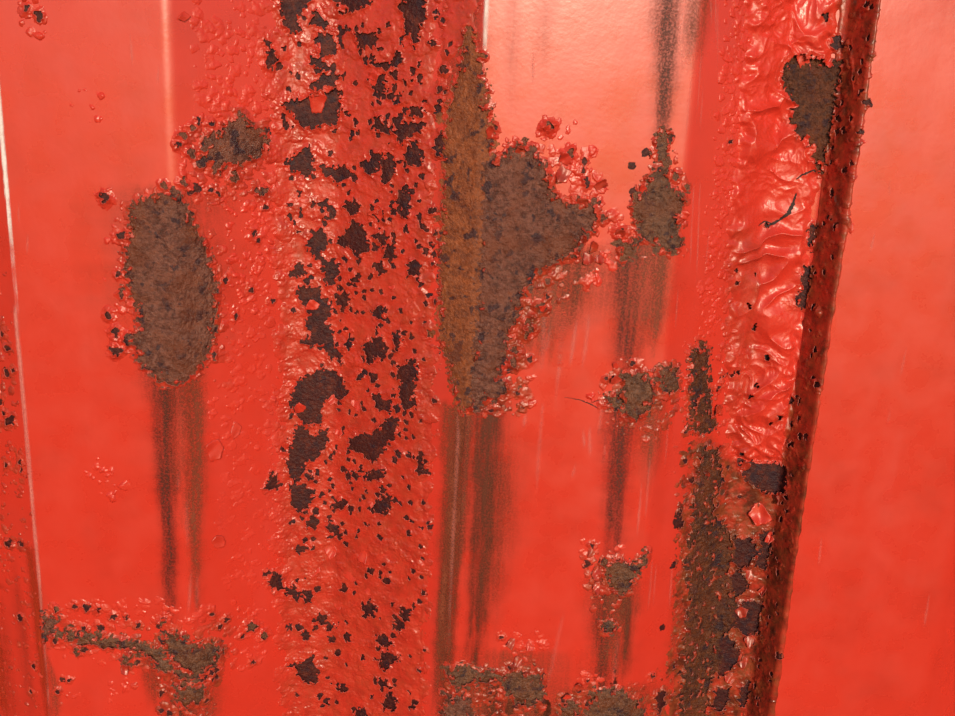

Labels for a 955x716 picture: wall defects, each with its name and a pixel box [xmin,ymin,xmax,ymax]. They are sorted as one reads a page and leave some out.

peeling [0,311,46,716]
corrosion [27,176,277,716]
corrosion [174,110,271,183]
peeling [254,0,464,716]
corrosion [427,0,787,716]